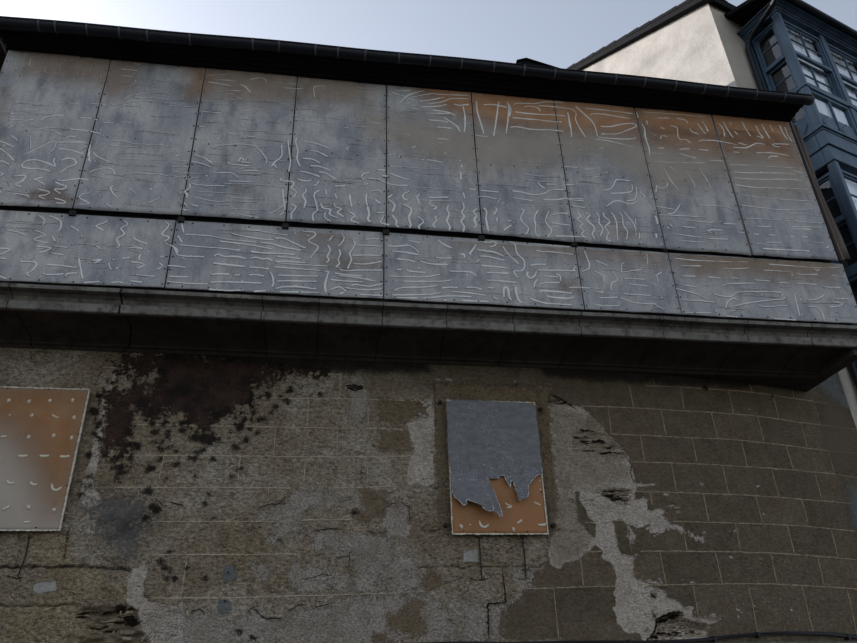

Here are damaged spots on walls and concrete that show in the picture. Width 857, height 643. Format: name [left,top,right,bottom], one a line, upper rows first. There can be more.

flaking render [79,371,118,509]
damp [0,352,429,500]
flaking render [340,369,372,430]
damp [141,485,162,522]
damp [351,486,388,523]
spalling [71,395,722,643]
crack [248,603,332,619]
crack [487,569,506,640]